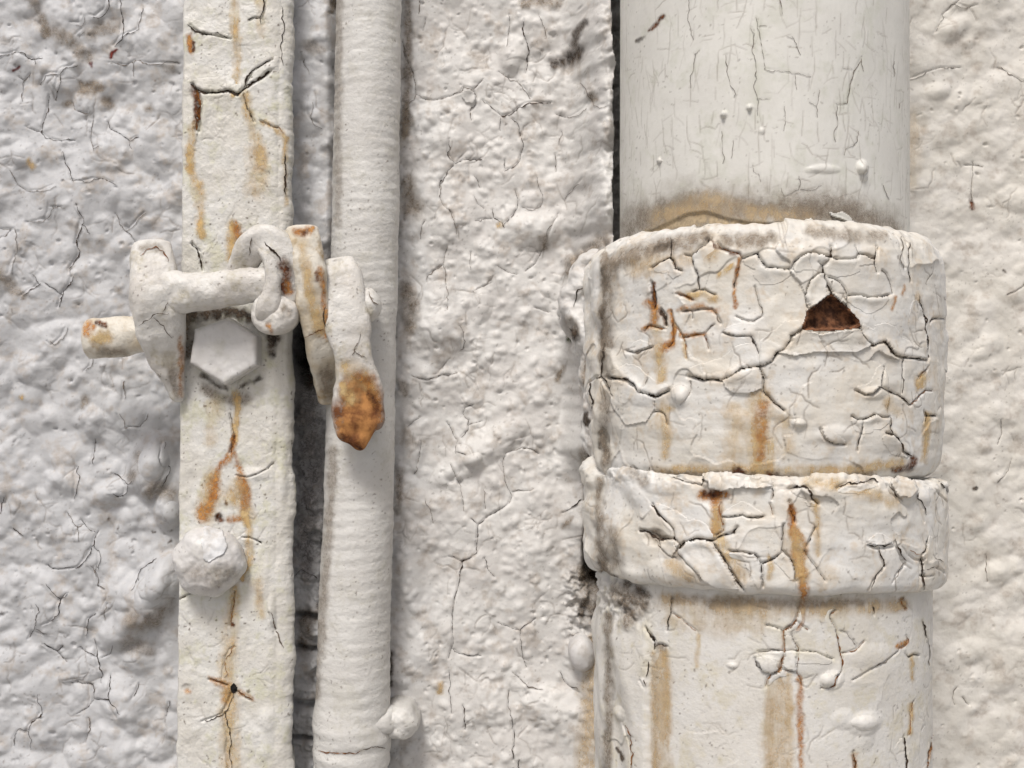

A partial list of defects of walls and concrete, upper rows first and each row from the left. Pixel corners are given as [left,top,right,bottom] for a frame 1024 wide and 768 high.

crack [1,52,137,345]
crack [29,440,139,743]
corrosion [198,392,252,626]
corrosion [279,261,328,337]
corrosion [320,363,385,451]
crack [447,405,539,726]
crack [402,1,607,380]
corrosion [643,282,717,382]
crack [588,236,944,458]
crack [640,478,945,689]
corrosion [788,504,808,608]
spalling [779,273,871,356]